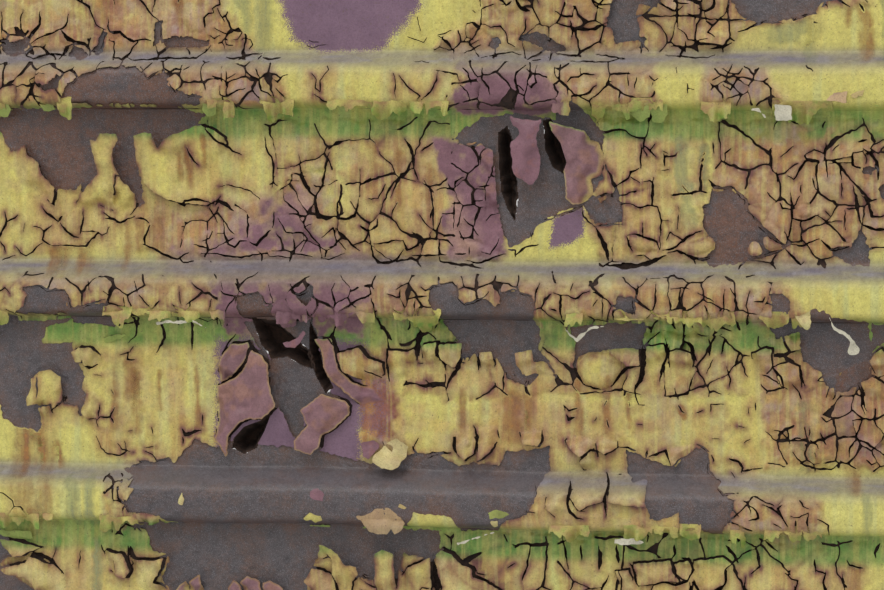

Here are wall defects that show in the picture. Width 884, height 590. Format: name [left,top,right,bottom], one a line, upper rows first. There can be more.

crack [312,66,329,102]
crack [393,0,808,102]
peeling [682,0,875,57]
crack [208,124,242,155]
peeling [0,0,700,270]
peeling [548,55,884,275]
crack [0,138,884,427]
crack [96,407,166,462]
crack [182,415,203,443]
peeling [0,268,884,590]
crack [412,426,500,458]
crack [774,383,884,470]